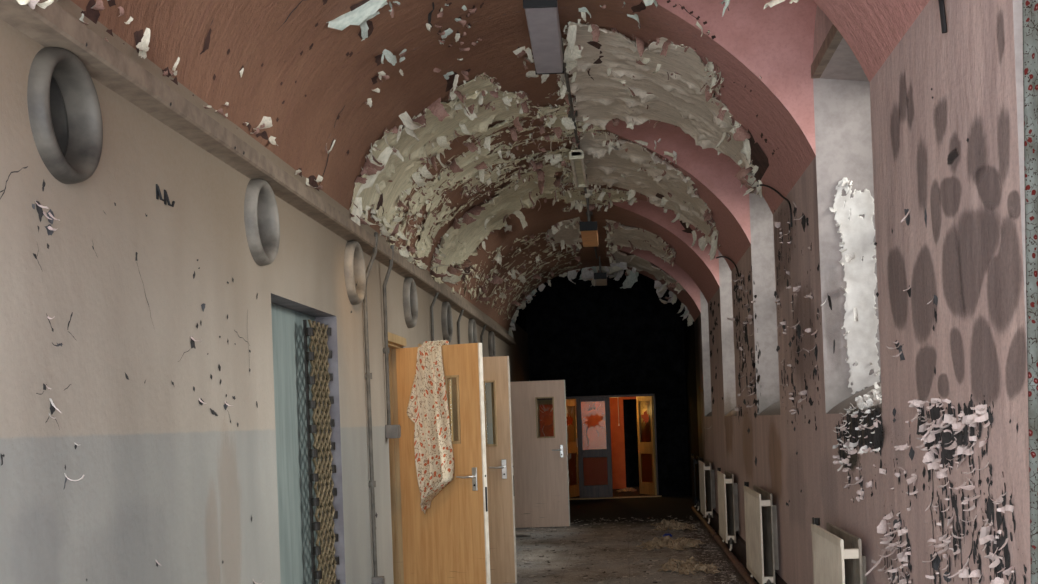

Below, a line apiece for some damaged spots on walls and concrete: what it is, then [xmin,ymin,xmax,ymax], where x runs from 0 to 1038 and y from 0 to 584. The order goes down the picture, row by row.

peeling [79,0,150,59]
peeling [315,0,400,41]
peeling [162,57,180,85]
crack [0,166,45,199]
peeling [237,116,279,146]
peeling [295,168,323,191]
peeling [349,0,779,337]
damp [947,138,969,164]
flaking render [32,201,60,249]
peeling [774,177,905,431]
peeling [710,266,761,434]
flaking render [833,394,1027,584]